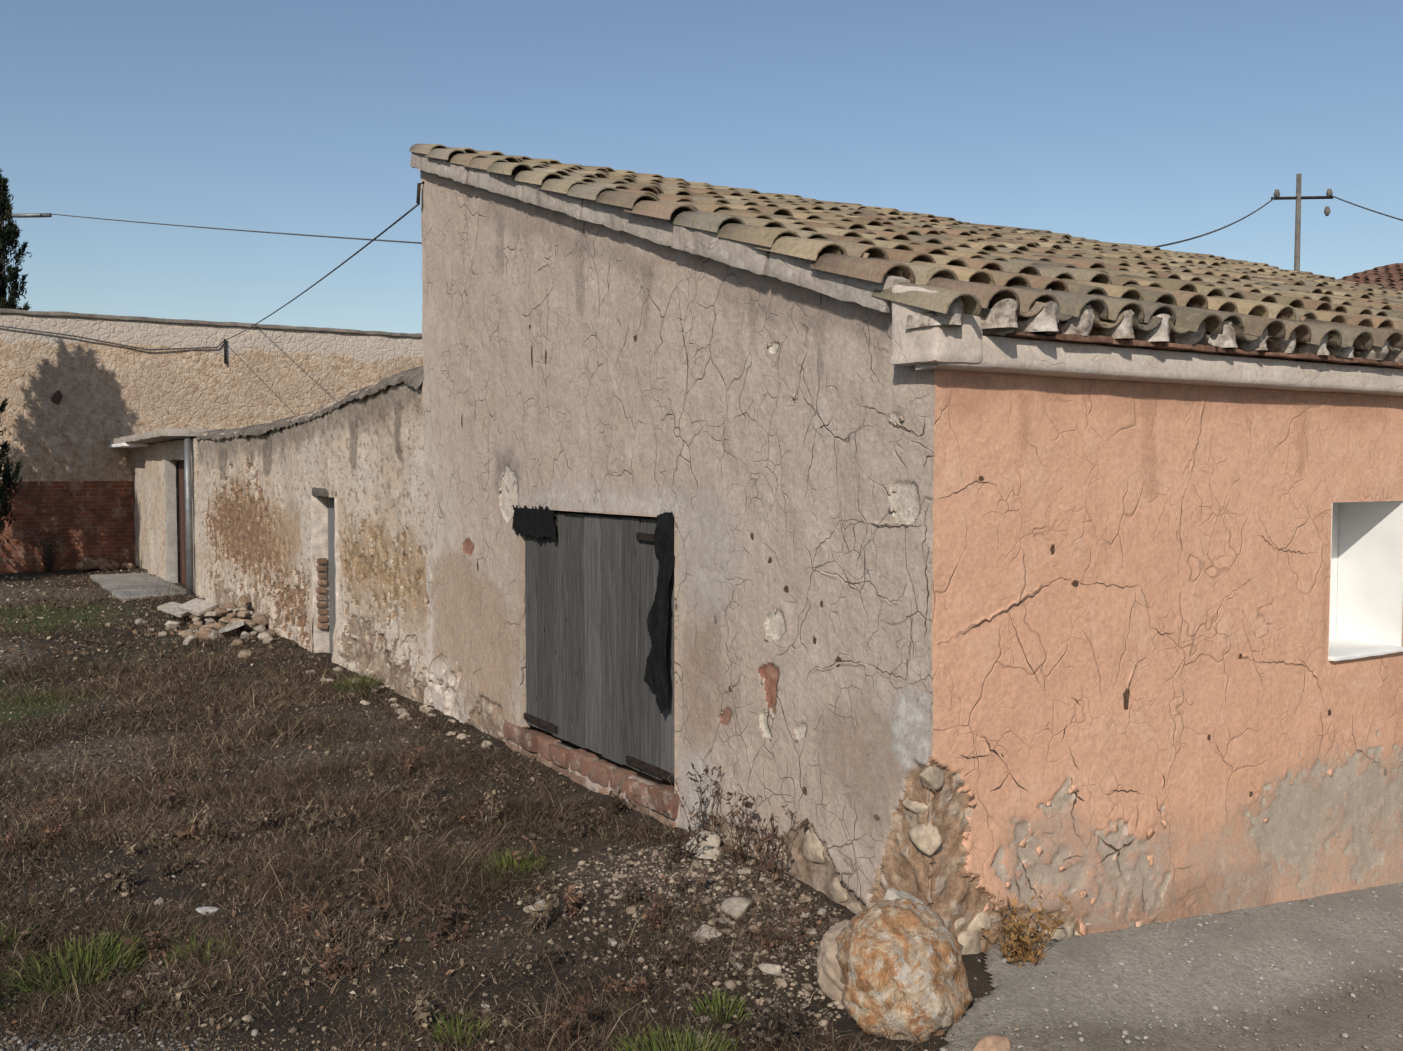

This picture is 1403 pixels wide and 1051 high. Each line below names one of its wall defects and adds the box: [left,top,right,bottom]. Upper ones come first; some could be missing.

peeling [202,455,311,648]
flaking render [338,509,428,705]
flaking render [497,465,519,523]
crack [677,291,714,423]
flaking render [758,662,779,741]
crack [789,293,935,496]
flaking render [888,481,920,525]
crack [758,481,1193,916]
crack [1179,392,1208,551]
crack [1211,580,1384,766]
flaking render [701,759,1172,955]